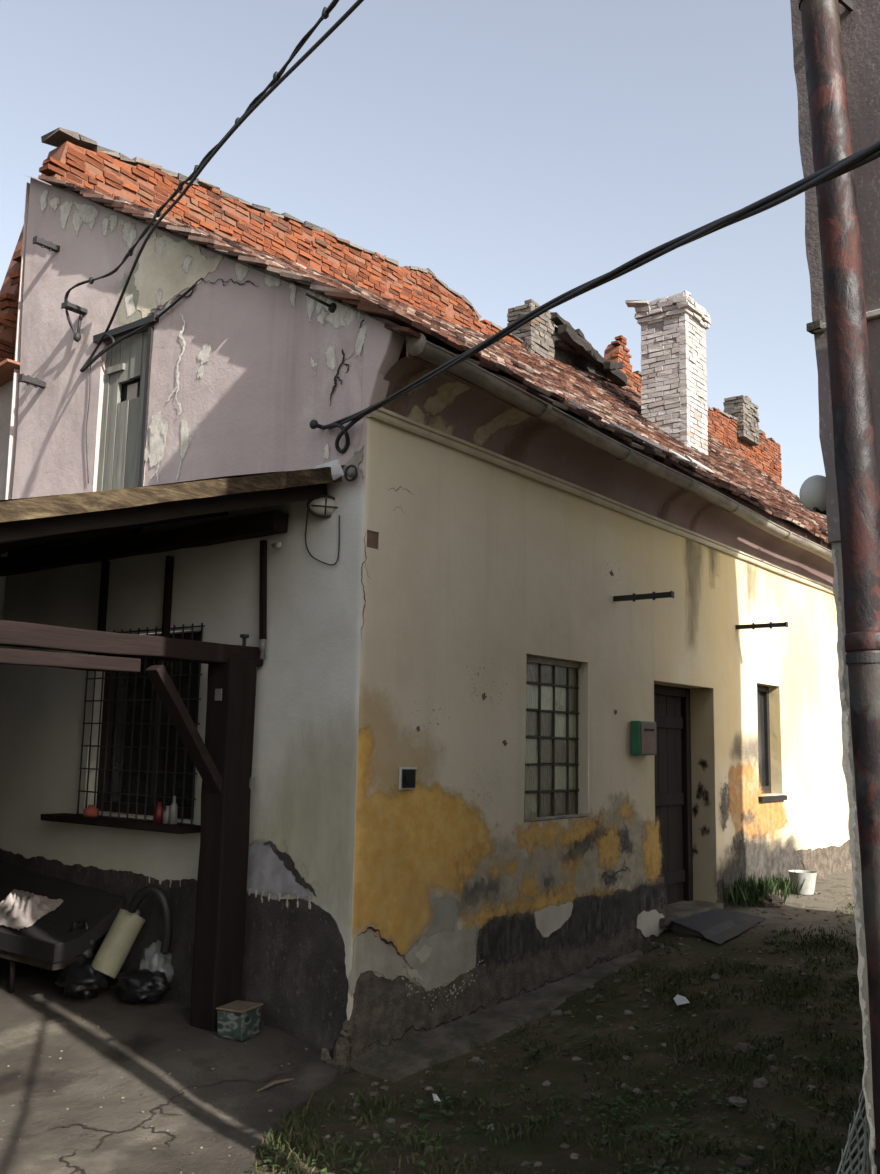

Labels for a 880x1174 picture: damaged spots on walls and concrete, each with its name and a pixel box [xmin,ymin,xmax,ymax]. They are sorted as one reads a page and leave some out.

peeling [40,189,249,325]
crack [148,278,259,419]
peeling [197,343,211,379]
peeling [264,269,367,356]
crack [330,315,365,405]
water stain [734,739,758,761]
peeling [692,763,788,853]
peeling [348,728,666,1010]
water stain [716,835,803,894]
flaking render [832,547,876,1174]
crack [49,1065,306,1174]